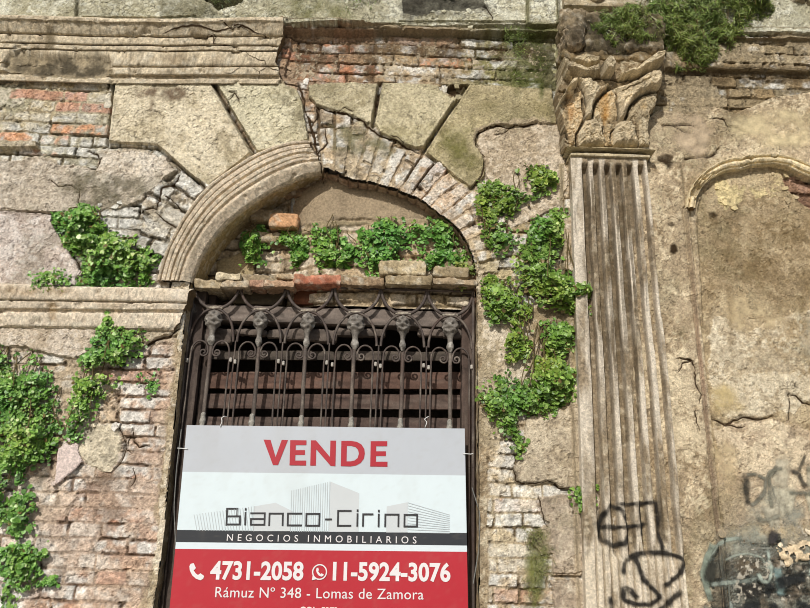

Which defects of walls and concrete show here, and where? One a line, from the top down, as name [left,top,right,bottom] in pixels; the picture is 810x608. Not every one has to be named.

spalling [285,0,558,103]
crack [163,20,418,187]
flaking render [715,171,810,211]
crack [678,357,810,431]
spalling [716,518,810,608]